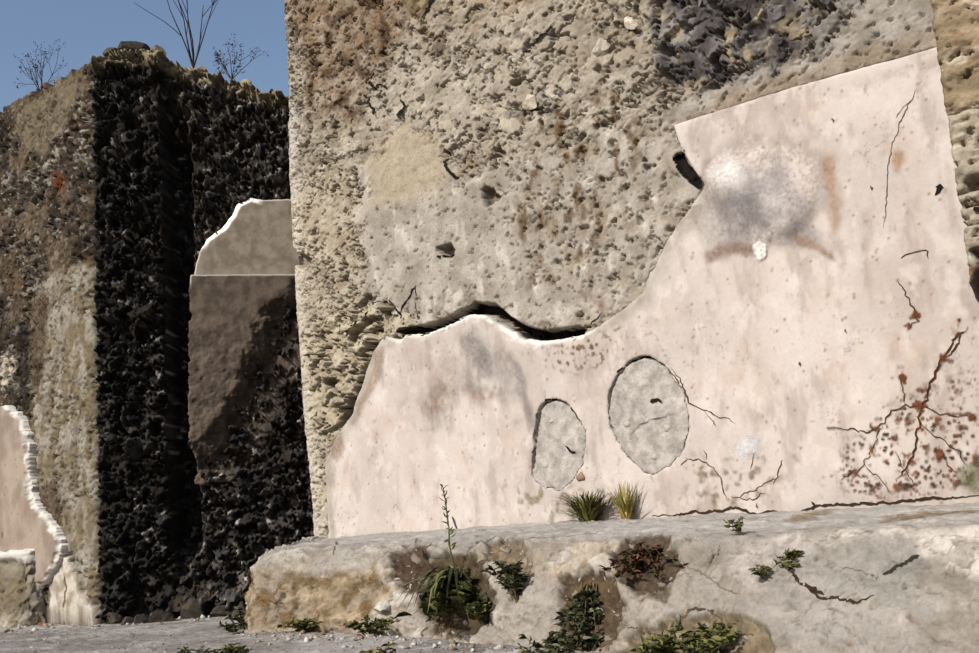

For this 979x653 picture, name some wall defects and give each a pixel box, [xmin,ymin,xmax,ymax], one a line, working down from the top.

crack [883,92,915,225]
crack [339,286,601,341]
spalling [531,397,586,490]
spalling [608,355,689,474]
crack [670,367,734,426]
crack [776,554,919,604]